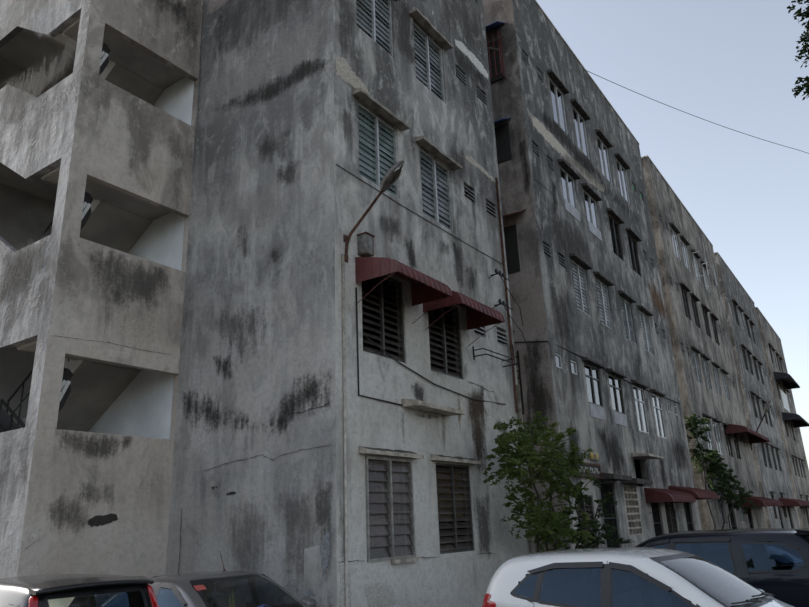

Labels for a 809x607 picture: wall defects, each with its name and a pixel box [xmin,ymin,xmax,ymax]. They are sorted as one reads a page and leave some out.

damp [230,59,324,107]
peeling [335,55,370,95]
spalling [455,39,489,79]
damp [98,252,163,303]
damp [216,358,231,377]
damp [184,391,227,428]
damp [270,379,329,433]
crack [206,401,331,471]
damp [474,499,490,552]